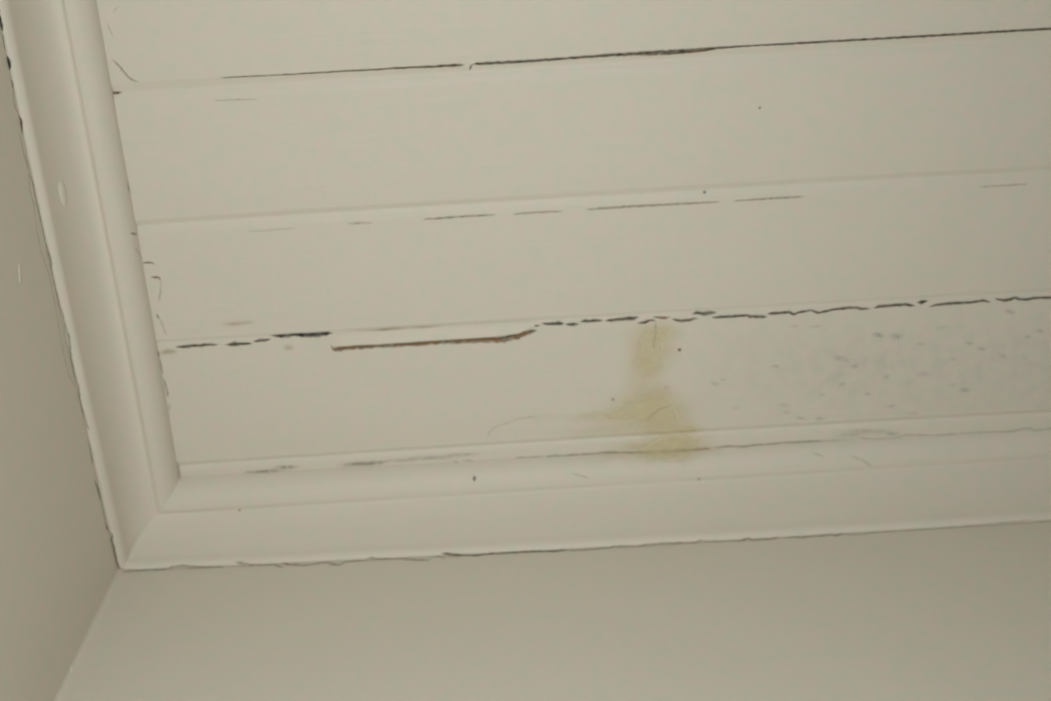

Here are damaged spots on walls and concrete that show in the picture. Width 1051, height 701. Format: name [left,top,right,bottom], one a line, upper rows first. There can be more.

crack [225,28,1051,78]
crack [158,297,1051,365]
crack [370,550,566,560]